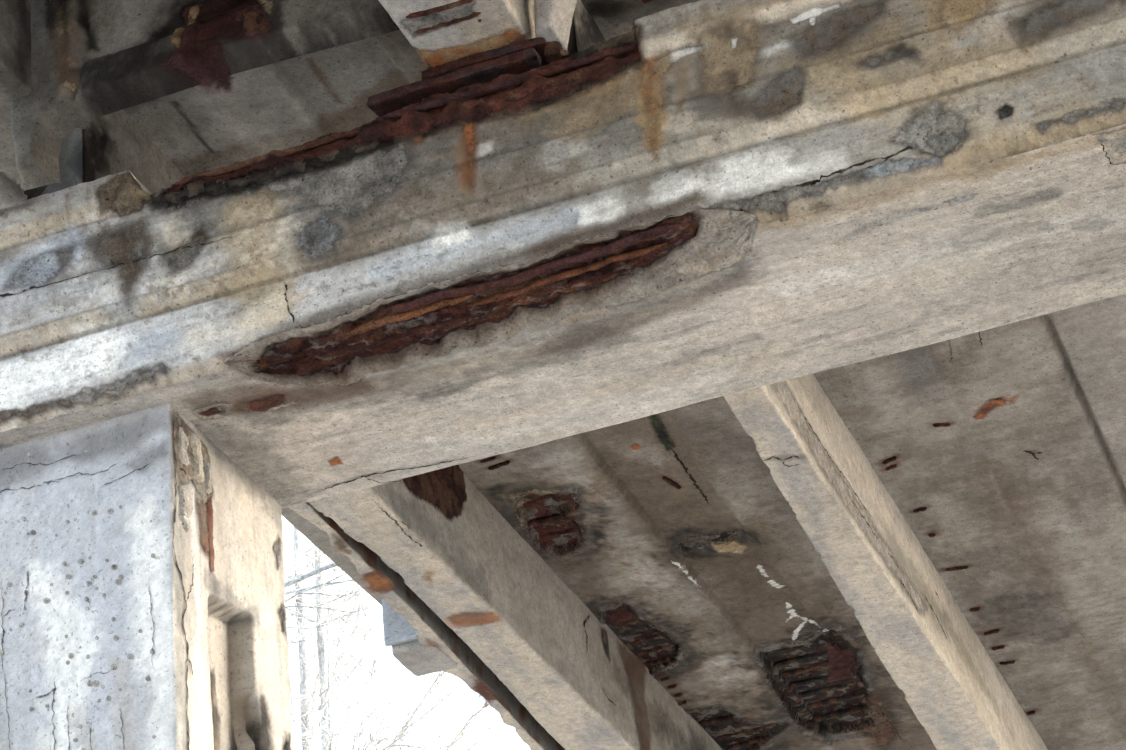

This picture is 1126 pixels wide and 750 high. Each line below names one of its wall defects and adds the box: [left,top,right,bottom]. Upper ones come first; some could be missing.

leakage [46,0,98,92]
spalling [87,24,642,296]
rust [461,122,477,188]
crack [761,146,913,195]
spalling [224,101,978,412]
rust [974,396,1017,420]
spalling [403,465,467,521]
crack [172,467,194,750]
crack [1,571,112,750]
leakage [210,669,220,750]
leakage [245,696,291,750]
rust [601,628,651,750]